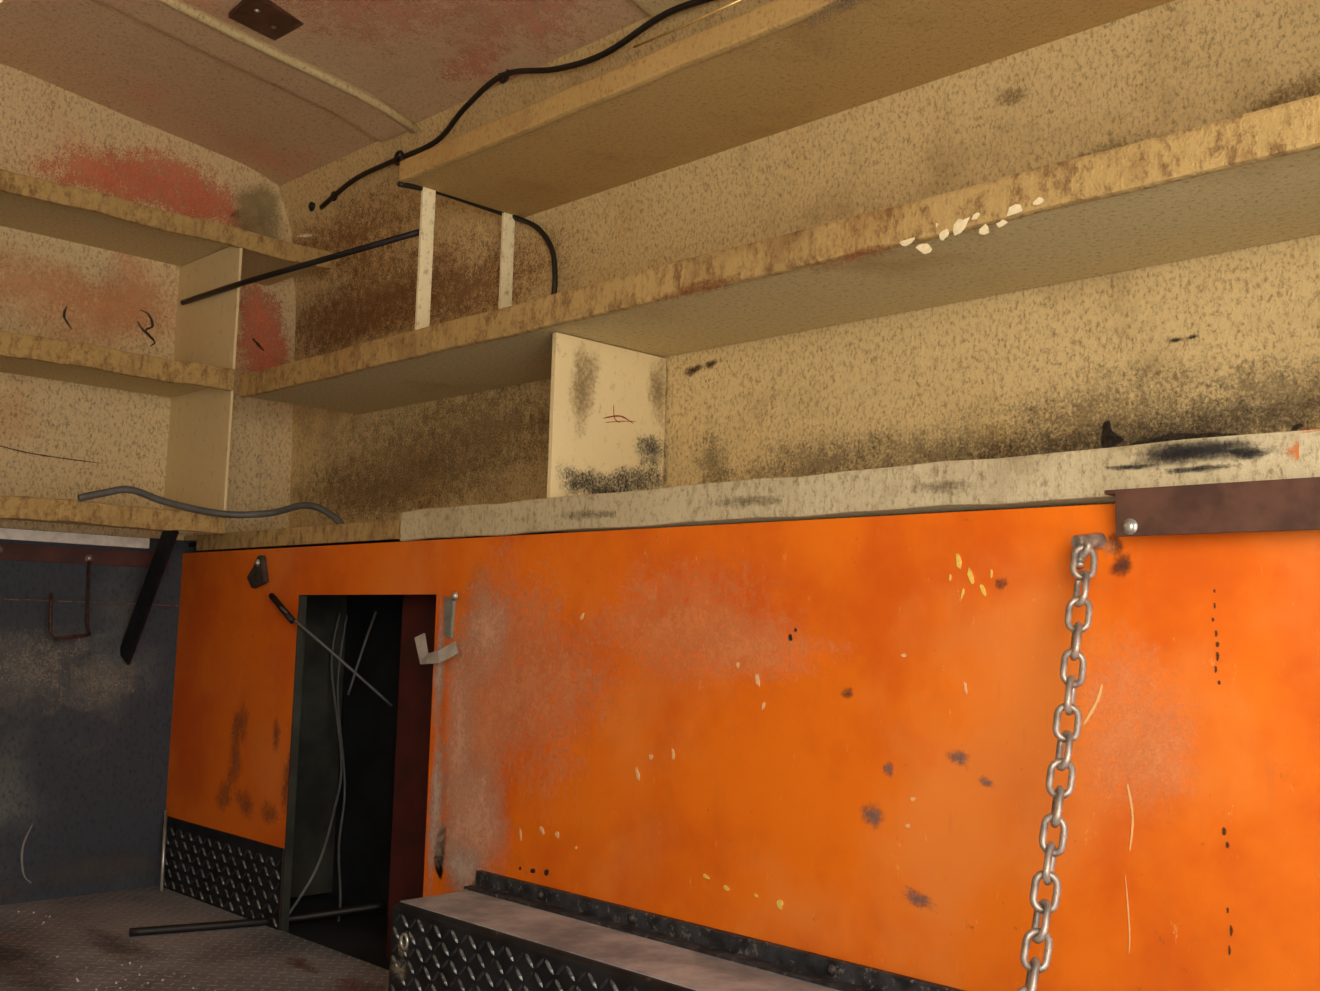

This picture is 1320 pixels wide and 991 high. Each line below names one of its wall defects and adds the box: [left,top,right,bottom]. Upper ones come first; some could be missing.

water stain [574,353,596,414]